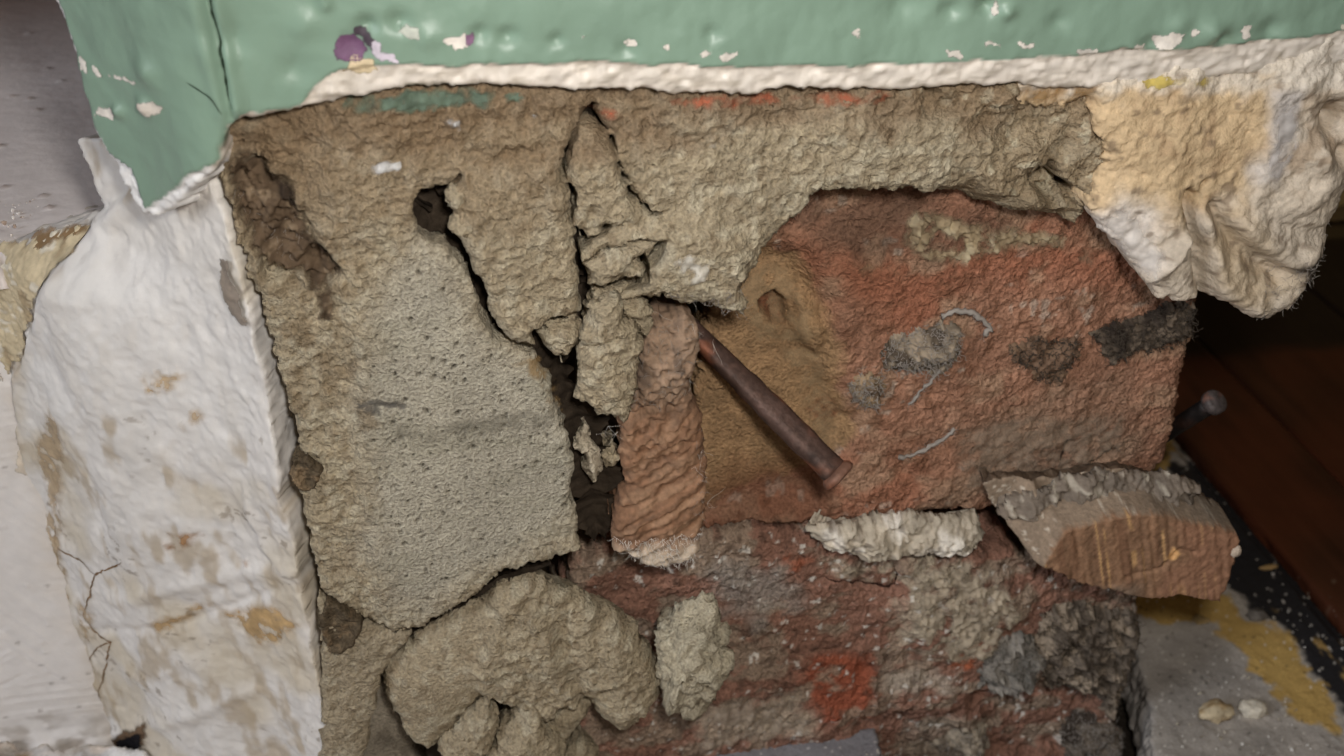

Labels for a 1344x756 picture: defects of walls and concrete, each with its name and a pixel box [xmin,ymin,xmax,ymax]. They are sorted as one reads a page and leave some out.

spalling [230,151,340,320]
spalling [908,213,1061,262]
peeling [219,259,248,326]
spalling [289,445,324,491]
crack [54,525,120,699]
spalling [317,593,365,654]
spalling [363,674,427,756]